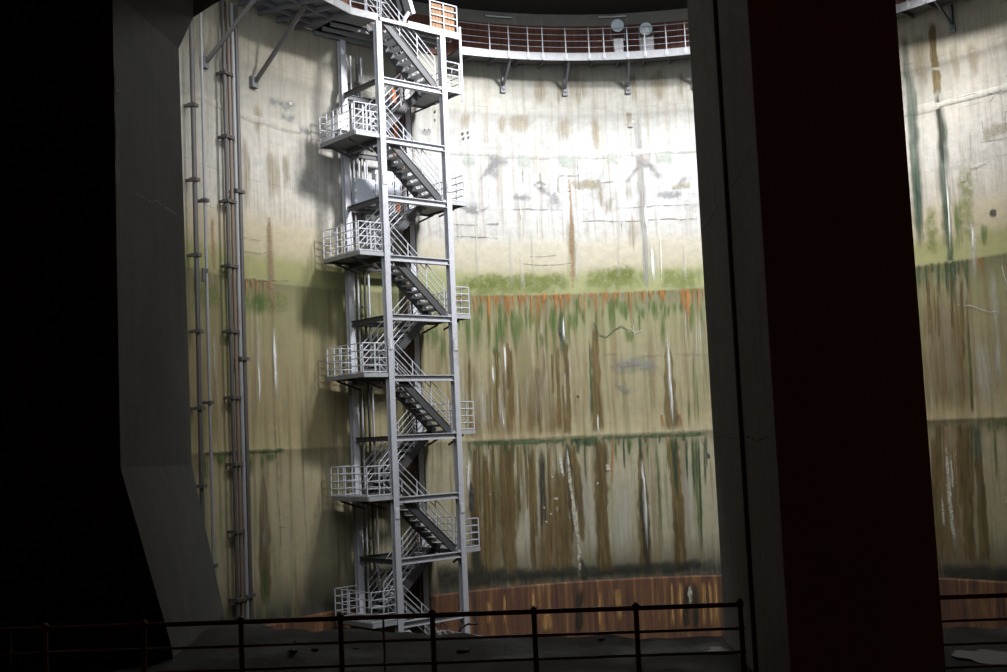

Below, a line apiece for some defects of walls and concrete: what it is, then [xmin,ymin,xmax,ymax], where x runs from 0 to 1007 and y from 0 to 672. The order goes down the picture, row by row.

water stain [904,65,922,231]
water stain [438,329,701,586]
water stain [931,426,1007,581]